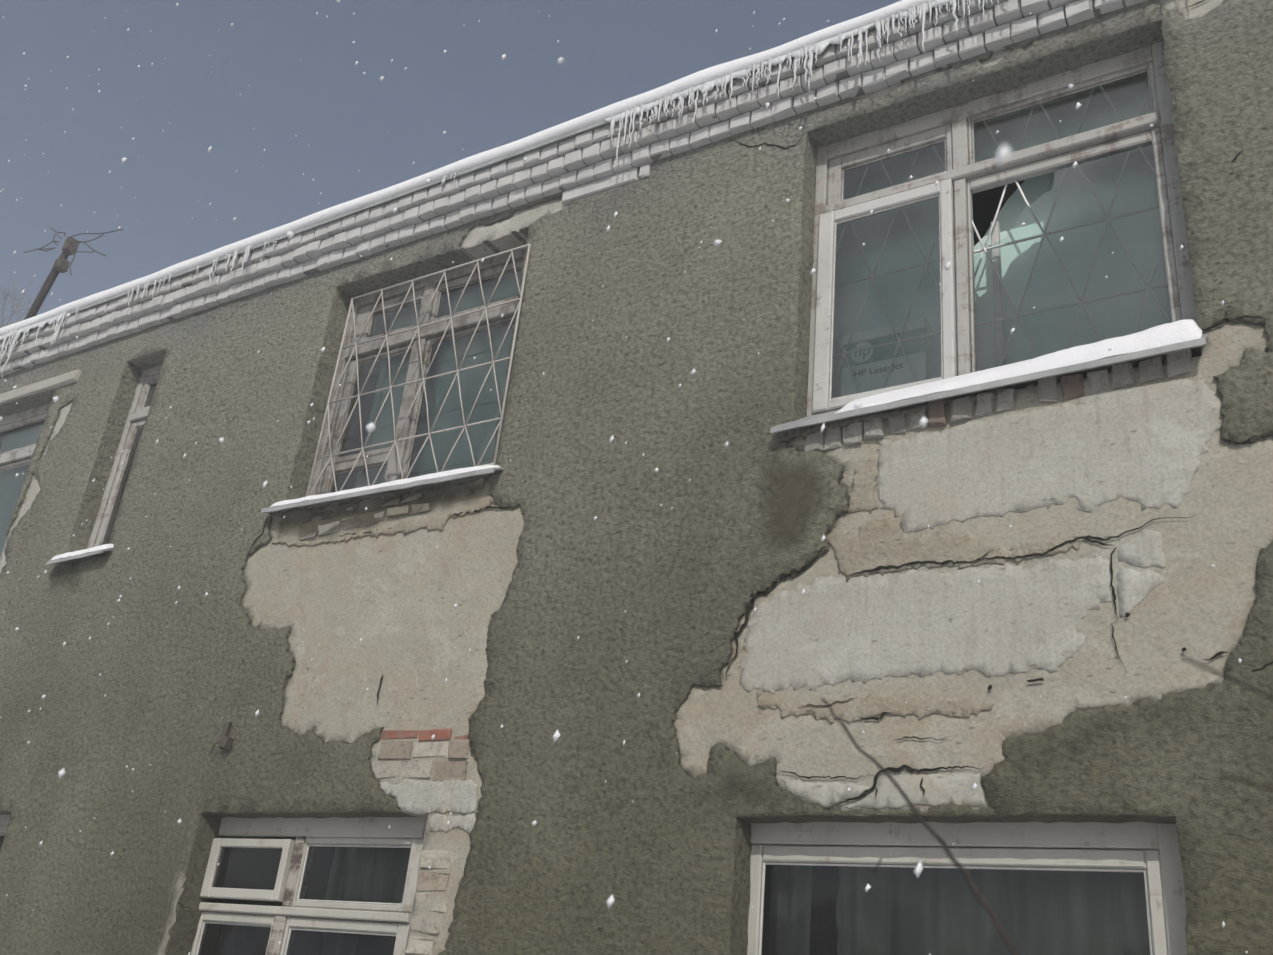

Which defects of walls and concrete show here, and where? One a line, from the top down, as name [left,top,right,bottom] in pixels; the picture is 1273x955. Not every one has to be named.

flaking render [42,401,73,458]
flaking render [0,475,41,573]
flaking render [241,477,525,955]
crack [725,546,826,680]
crack [780,697,985,810]
flaking render [672,320,1273,814]
crack [847,514,1197,673]
crack [1203,651,1273,671]